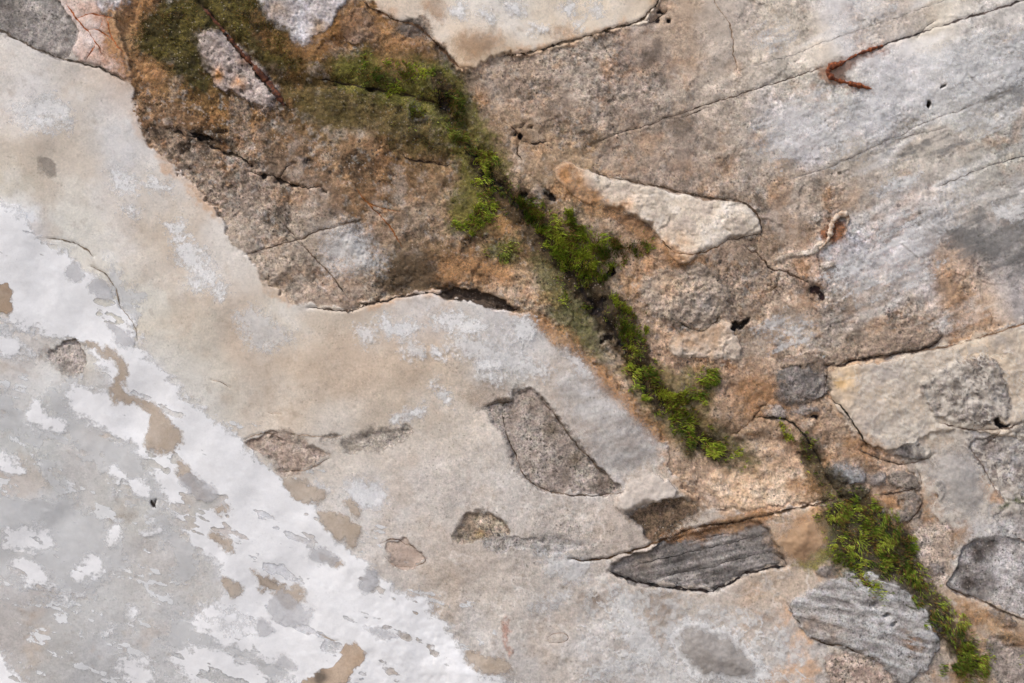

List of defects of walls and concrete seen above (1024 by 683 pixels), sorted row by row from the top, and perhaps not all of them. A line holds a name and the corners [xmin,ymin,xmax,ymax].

corrosion [202,7,285,106]
peeling [257,0,346,45]
crack [599,0,1023,142]
crack [165,127,320,193]
crack [791,84,1024,179]
crack [48,238,138,341]
crack [244,184,522,313]
peeling [555,162,761,264]
peeling [669,321,742,360]
peeling [0,202,512,683]
spalling [476,355,785,591]
peeling [828,328,1024,617]